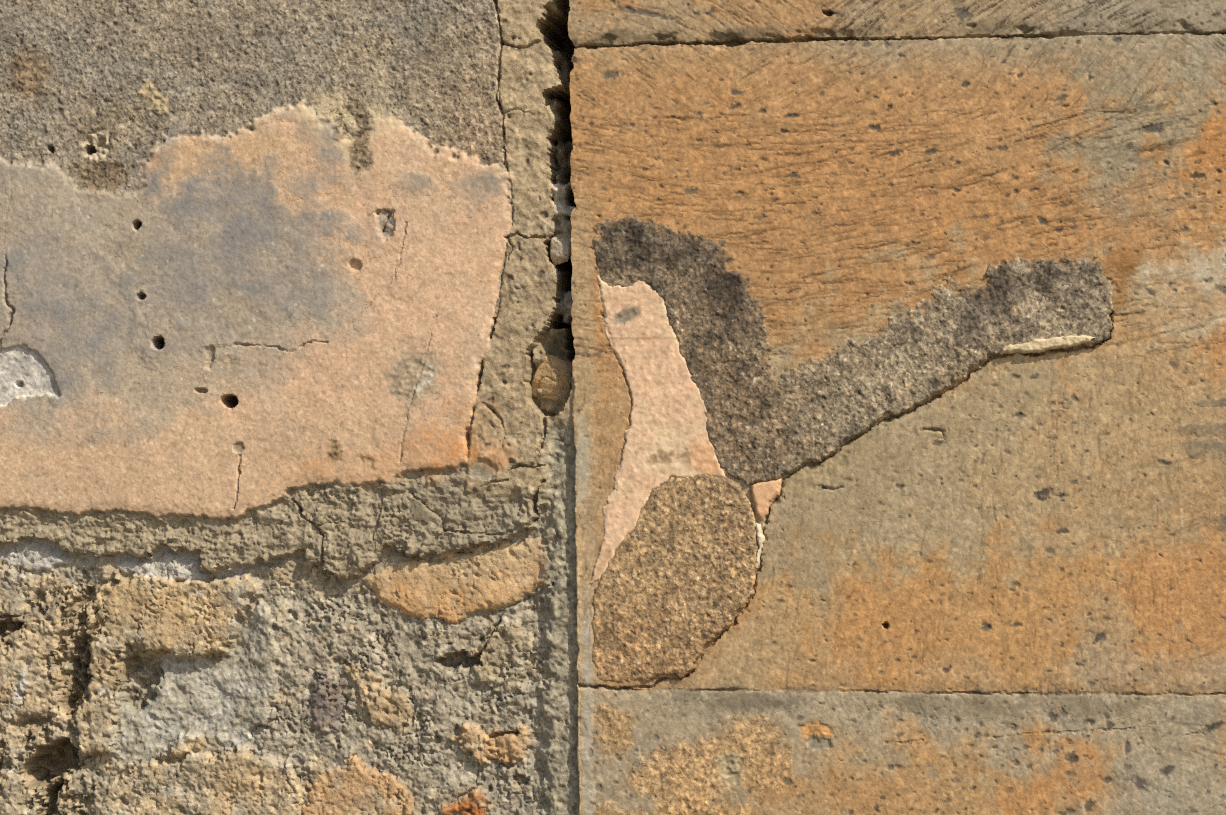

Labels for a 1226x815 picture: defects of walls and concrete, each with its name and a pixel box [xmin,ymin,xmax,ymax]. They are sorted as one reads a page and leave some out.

crack [1,130,14,249]
flaking render [74,128,131,194]
flaking render [333,99,374,175]
peeling [373,208,396,243]
crack [492,0,543,183]
crack [215,220,408,353]
flaking render [381,352,443,421]
peeling [587,213,1114,683]
spalling [111,546,287,583]
hole [0,618,24,637]
hole [9,639,93,815]
spalling [108,597,282,764]